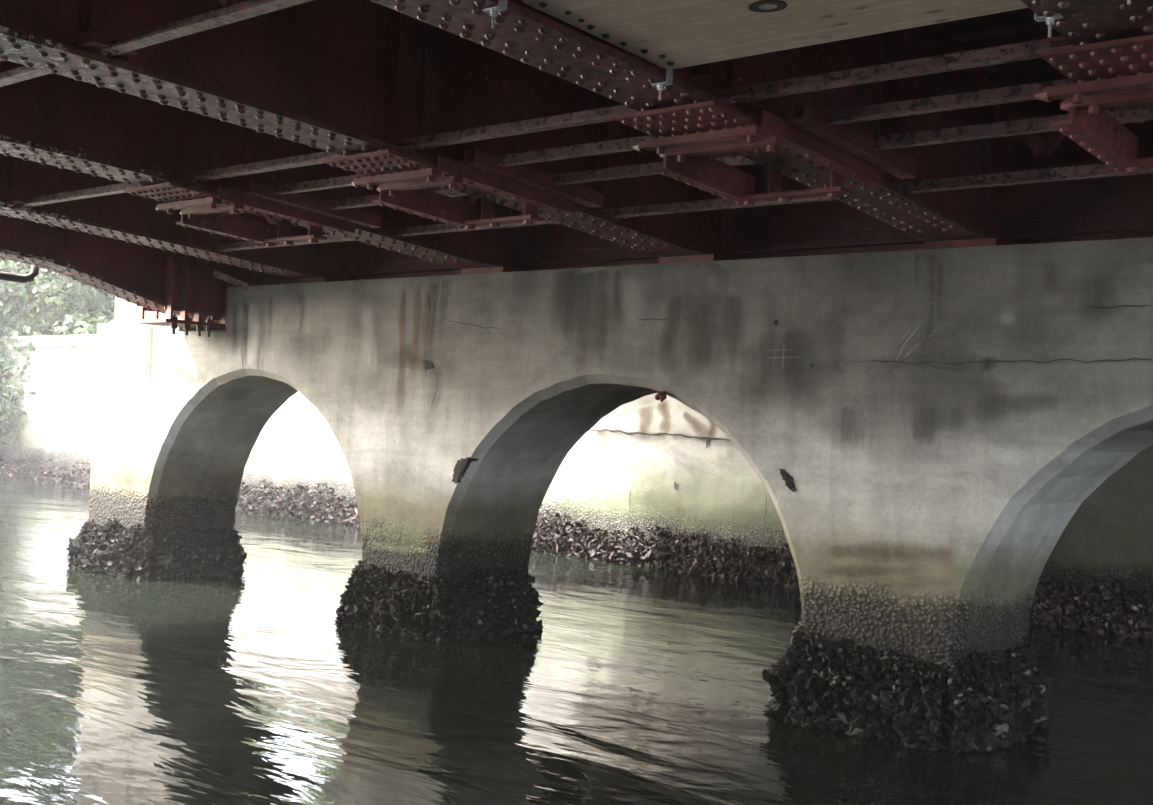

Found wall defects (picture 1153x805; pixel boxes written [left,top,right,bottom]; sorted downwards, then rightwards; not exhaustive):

crack [1085,303,1150,311]
crack [848,358,1152,369]
spalling [779,468,796,492]